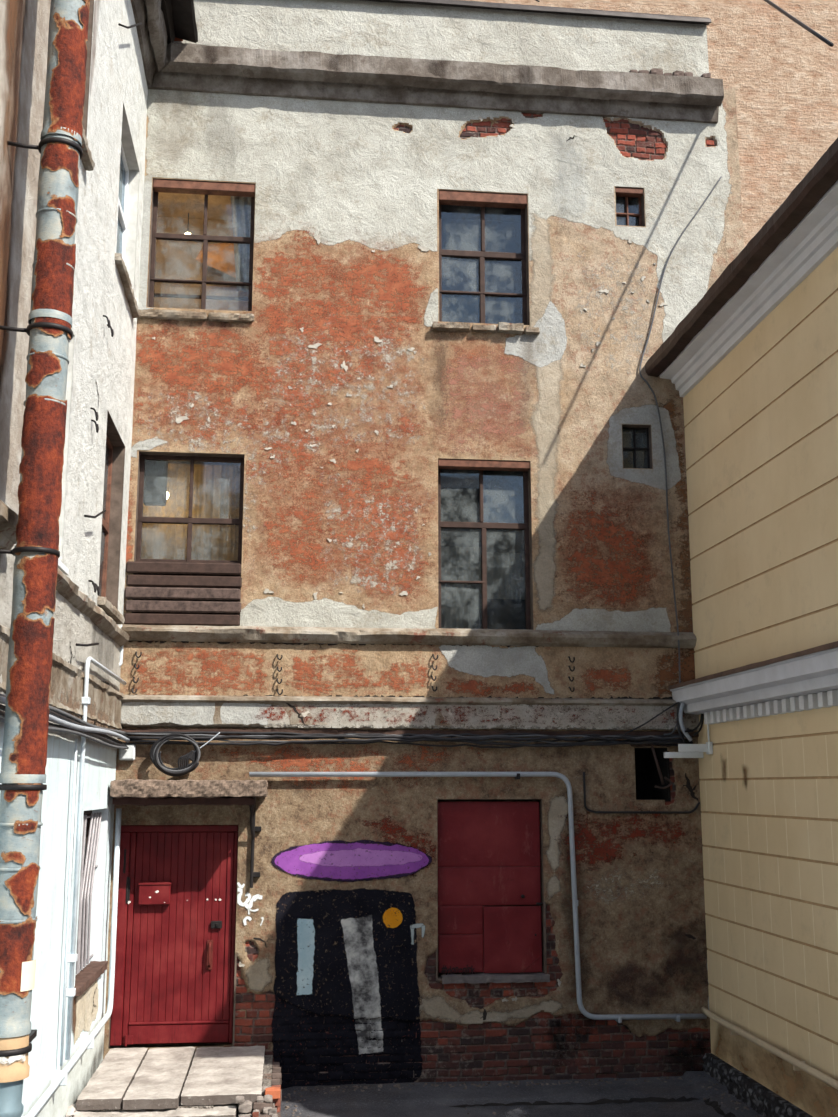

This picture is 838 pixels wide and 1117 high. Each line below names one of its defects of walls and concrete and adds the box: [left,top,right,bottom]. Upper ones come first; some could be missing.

corrosion [0,0,23,380]
corrosion [4,0,90,834]
flaking render [132,89,732,632]
peeling [134,642,699,730]
peeling [210,743,484,793]
corrosion [0,851,40,998]
flaking render [224,941,711,1089]
flaking render [424,904,563,1009]
flaking render [666,922,707,992]